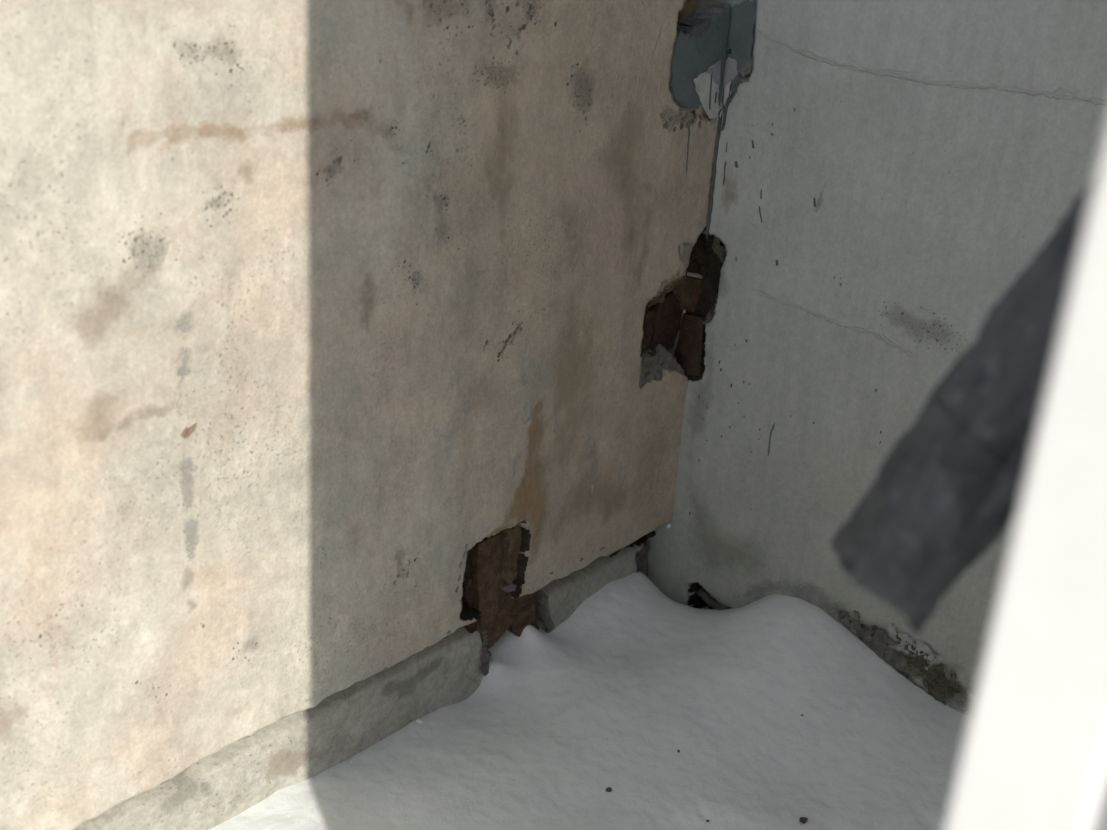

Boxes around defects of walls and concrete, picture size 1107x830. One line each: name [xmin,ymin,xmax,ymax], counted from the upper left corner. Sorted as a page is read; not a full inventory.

spalling [676,0,728,35]
peeling [660,61,752,132]
crack [755,29,1107,106]
spalling [639,227,727,389]
spalling [455,521,555,676]
damp [838,610,973,712]